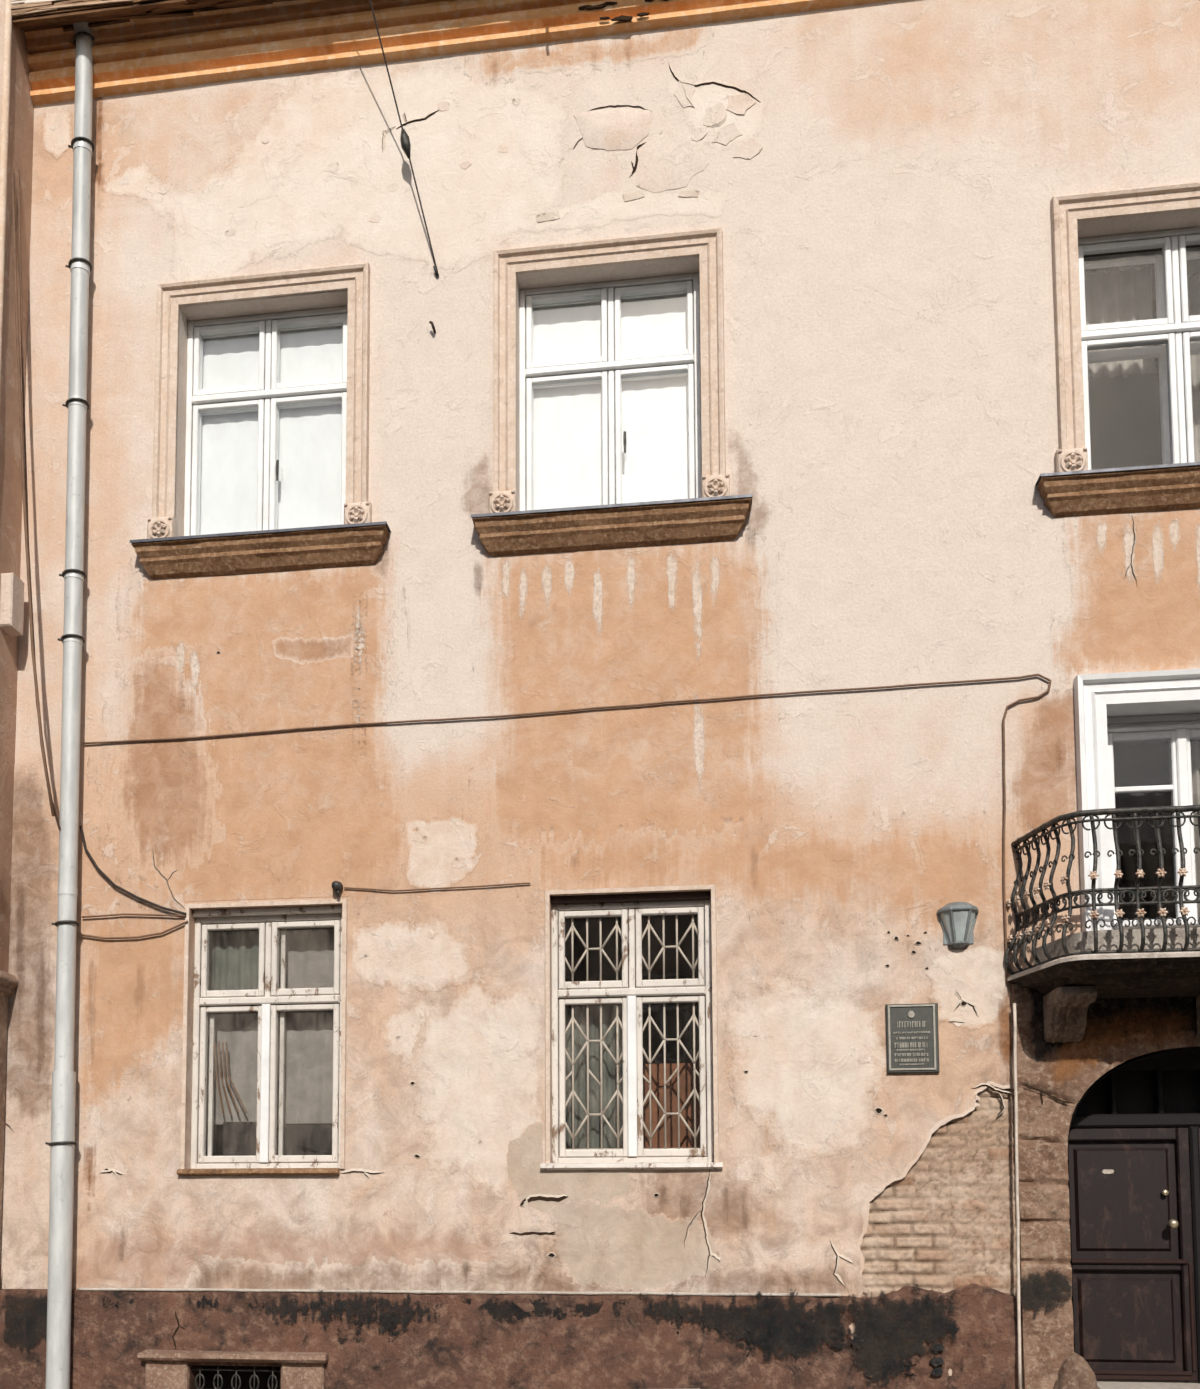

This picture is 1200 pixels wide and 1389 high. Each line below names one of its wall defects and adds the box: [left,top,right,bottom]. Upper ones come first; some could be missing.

crack [382,110,439,153]
peeling [99,58,730,281]
flaking render [666,74,769,159]
water stain [459,422,1200,951]
water stain [5,756,59,1130]
water stain [74,519,418,1128]
peeling [404,815,479,894]
peeling [352,913,543,1203]
water stain [4,1295,47,1351]
water stain [72,1160,869,1365]
crack [684,1169,721,1277]
spalling [857,1081,1021,1297]